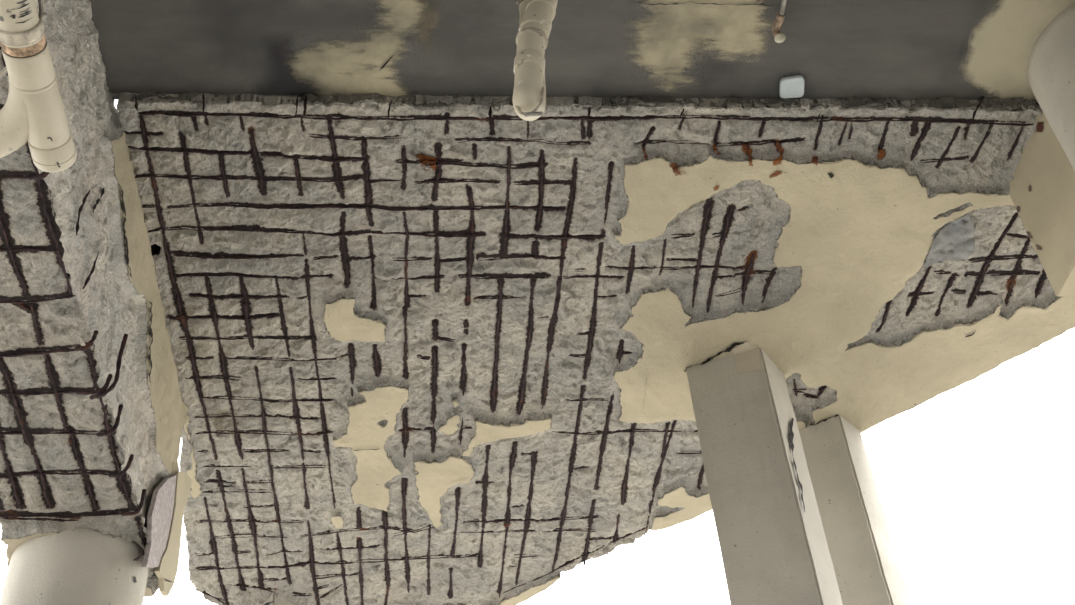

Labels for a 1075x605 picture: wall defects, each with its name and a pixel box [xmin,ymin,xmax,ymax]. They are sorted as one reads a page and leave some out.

peeling [286,0,425,97]
peeling [632,0,771,90]
peeling [905,0,1075,121]
corrosion [415,153,437,171]
corrosion [741,143,753,166]
corrosion [770,139,784,178]
spalling [0,0,174,561]
spalling [116,91,1061,605]